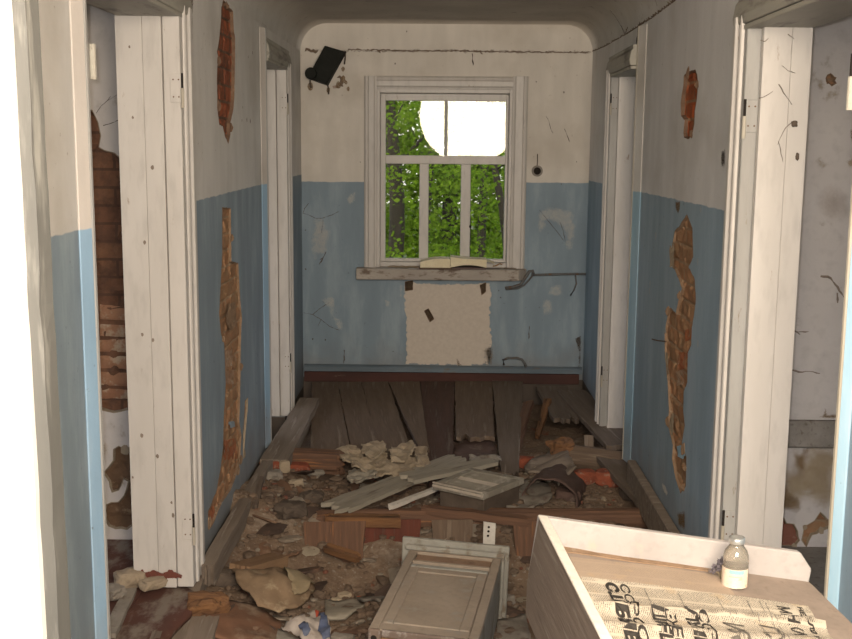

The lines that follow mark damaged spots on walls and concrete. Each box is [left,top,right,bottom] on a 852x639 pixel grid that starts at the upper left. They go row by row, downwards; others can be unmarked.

flaking render [217,0,235,143]
crack [317,0,675,65]
flaking render [681,66,699,139]
flaking render [90,109,128,413]
peeling [208,207,248,530]
flaking render [404,281,501,366]
peeling [652,201,696,494]
peeling [104,445,132,530]
water stain [784,448,833,512]